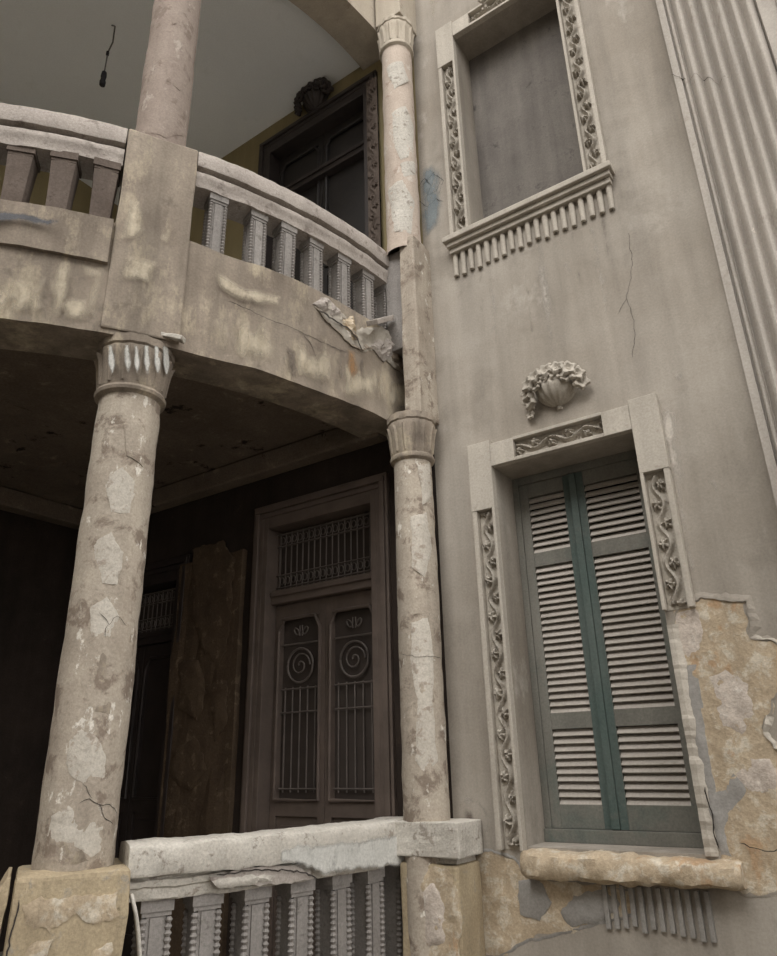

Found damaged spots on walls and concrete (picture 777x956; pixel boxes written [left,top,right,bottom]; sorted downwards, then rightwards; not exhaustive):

peeling [105,419,152,514]
peeling [94,532,124,585]
peeling [90,598,119,637]
peeling [66,729,106,783]
peeling [667,592,777,898]
crack [80,785,117,824]
peeling [47,805,103,865]
crack [6,901,20,956]
peeling [476,848,631,956]